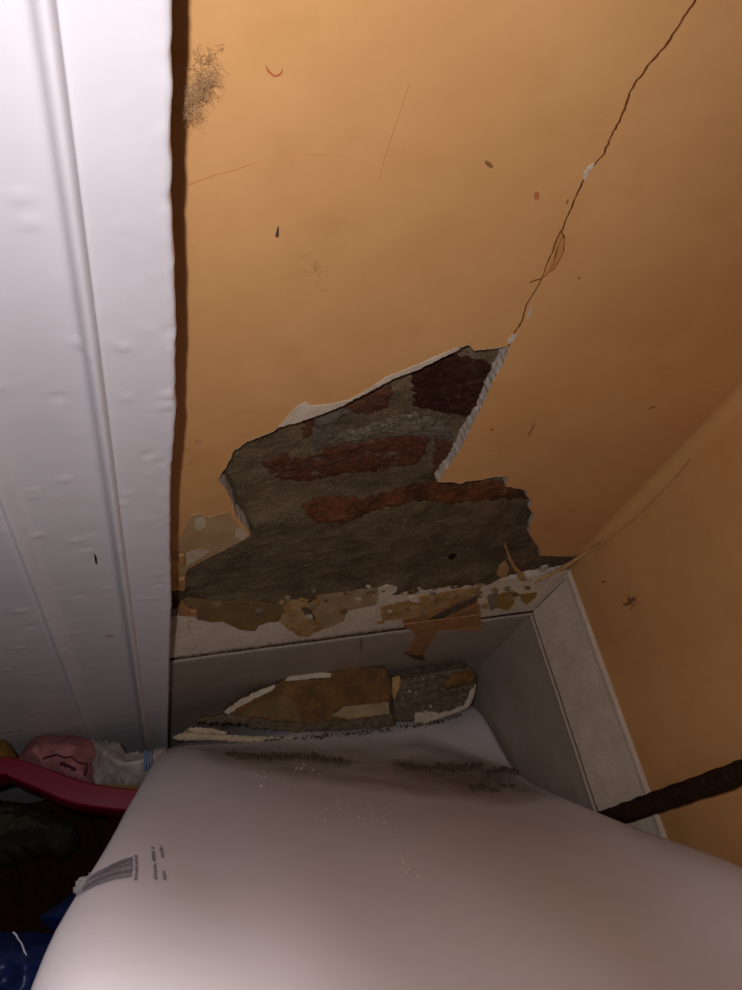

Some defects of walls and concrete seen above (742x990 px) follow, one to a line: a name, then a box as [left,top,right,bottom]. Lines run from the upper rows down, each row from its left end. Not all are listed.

crack [507,0,696,346]
flaking render [171,345,576,661]